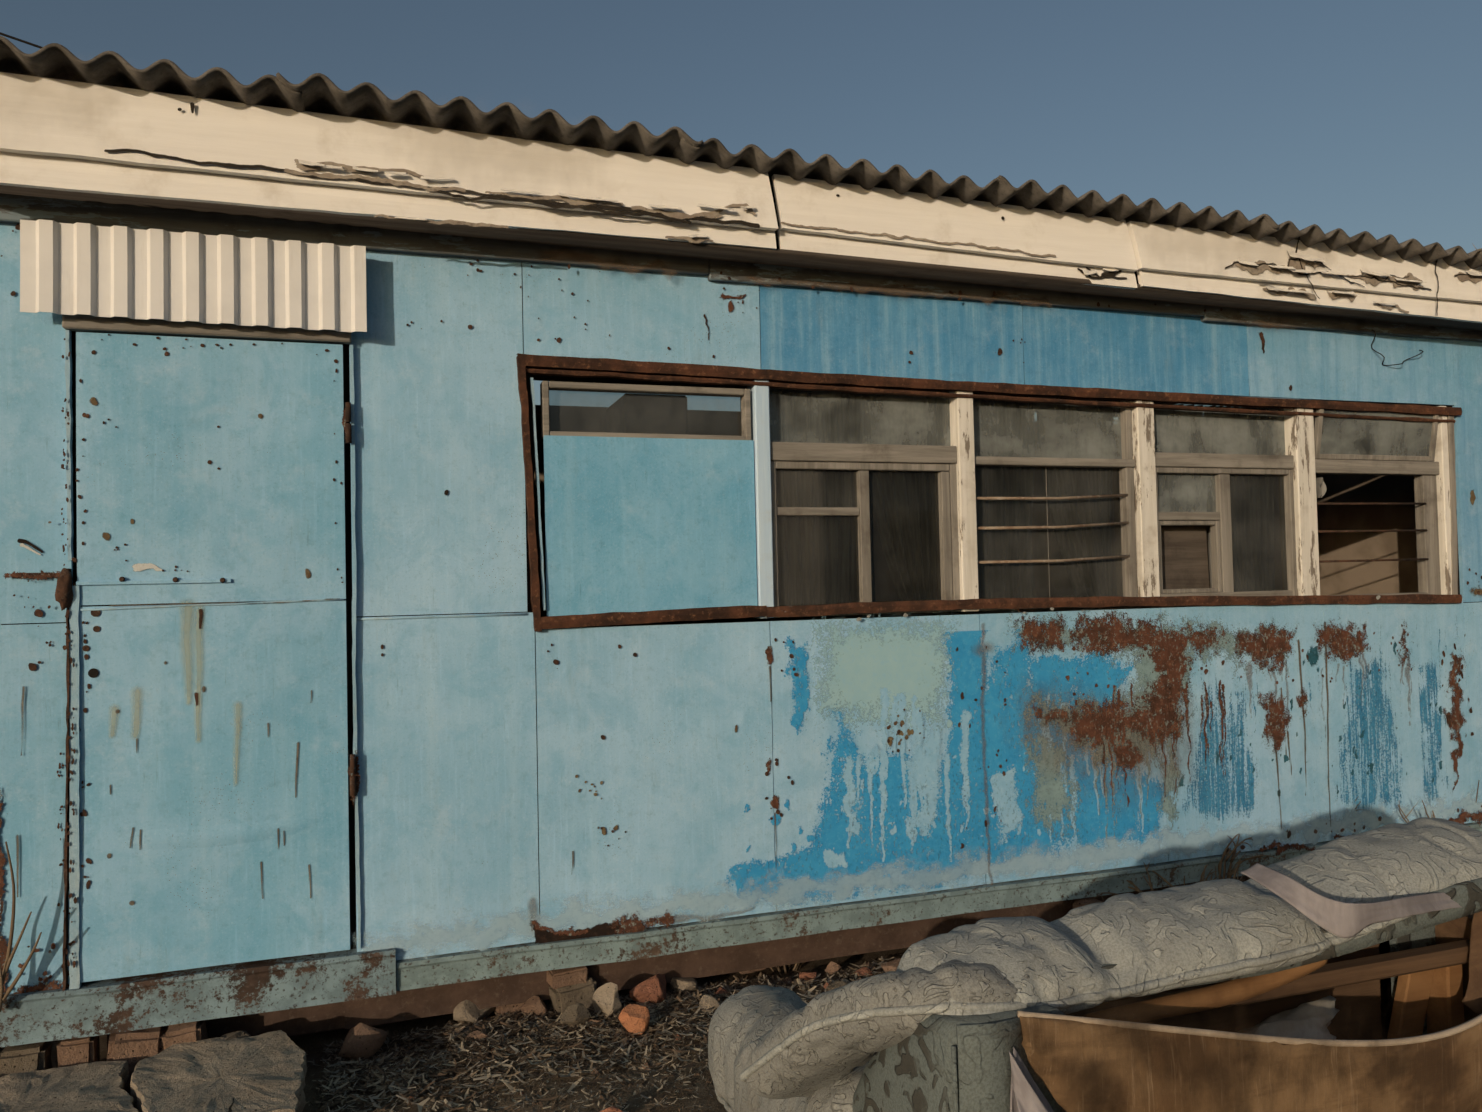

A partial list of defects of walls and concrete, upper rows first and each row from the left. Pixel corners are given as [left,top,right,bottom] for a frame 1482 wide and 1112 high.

peeling [104,149,760,243]
peeling [1077,267,1127,279]
peeling [1231,249,1427,313]
peeling [1455,270,1482,283]
rust [3,397,117,923]
rust [109,602,253,740]
peeling [725,607,1453,911]
rust [1015,608,1415,856]
rust [1441,634,1474,790]
rust [1445,805,1482,826]
rust [0,790,76,995]
rust [610,909,675,935]